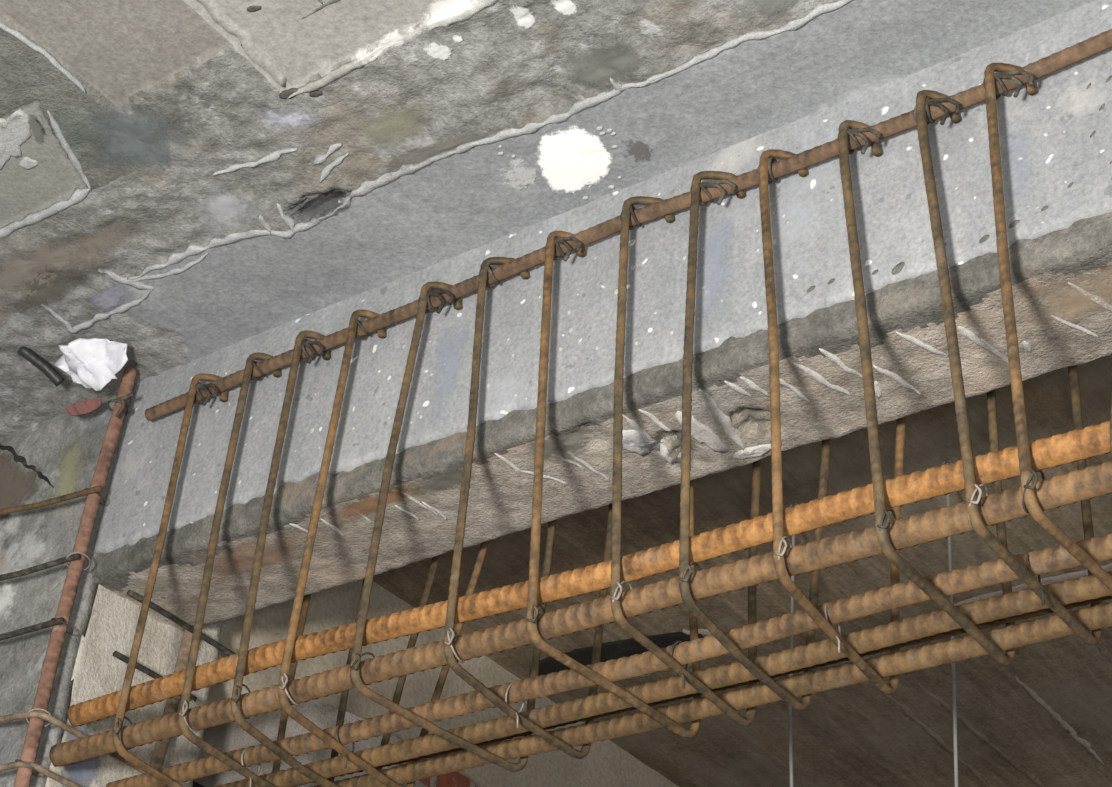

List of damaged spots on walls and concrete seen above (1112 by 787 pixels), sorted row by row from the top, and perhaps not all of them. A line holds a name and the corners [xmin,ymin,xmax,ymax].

crack [42,0,853,333]
spalling [622,408,771,467]
spalling [0,367,138,787]
peeling [953,563,1112,606]
spalling [113,590,236,679]
spalling [530,629,712,676]
spalling [163,694,197,716]
spalling [108,739,170,774]